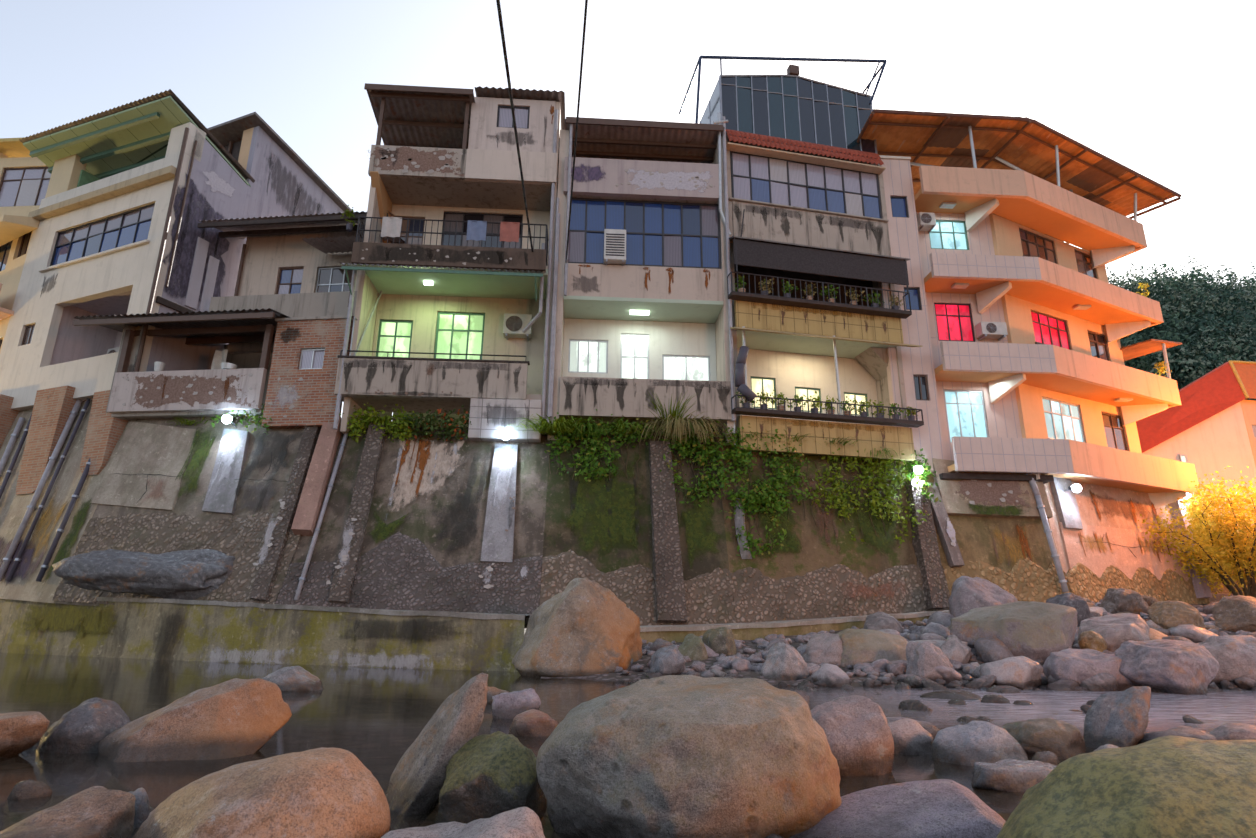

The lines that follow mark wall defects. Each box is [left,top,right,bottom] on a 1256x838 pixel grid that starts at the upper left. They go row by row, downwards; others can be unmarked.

peeling [368,146,464,177]
peeling [615,169,713,193]
damp [734,206,790,235]
damp [816,216,844,241]
damp [865,225,883,251]
damp [344,363,353,390]
damp [366,362,412,391]
damp [476,368,499,393]
peeling [122,373,304,417]
damp [564,381,627,409]
damp [683,384,731,411]
corrosion [395,438,431,494]